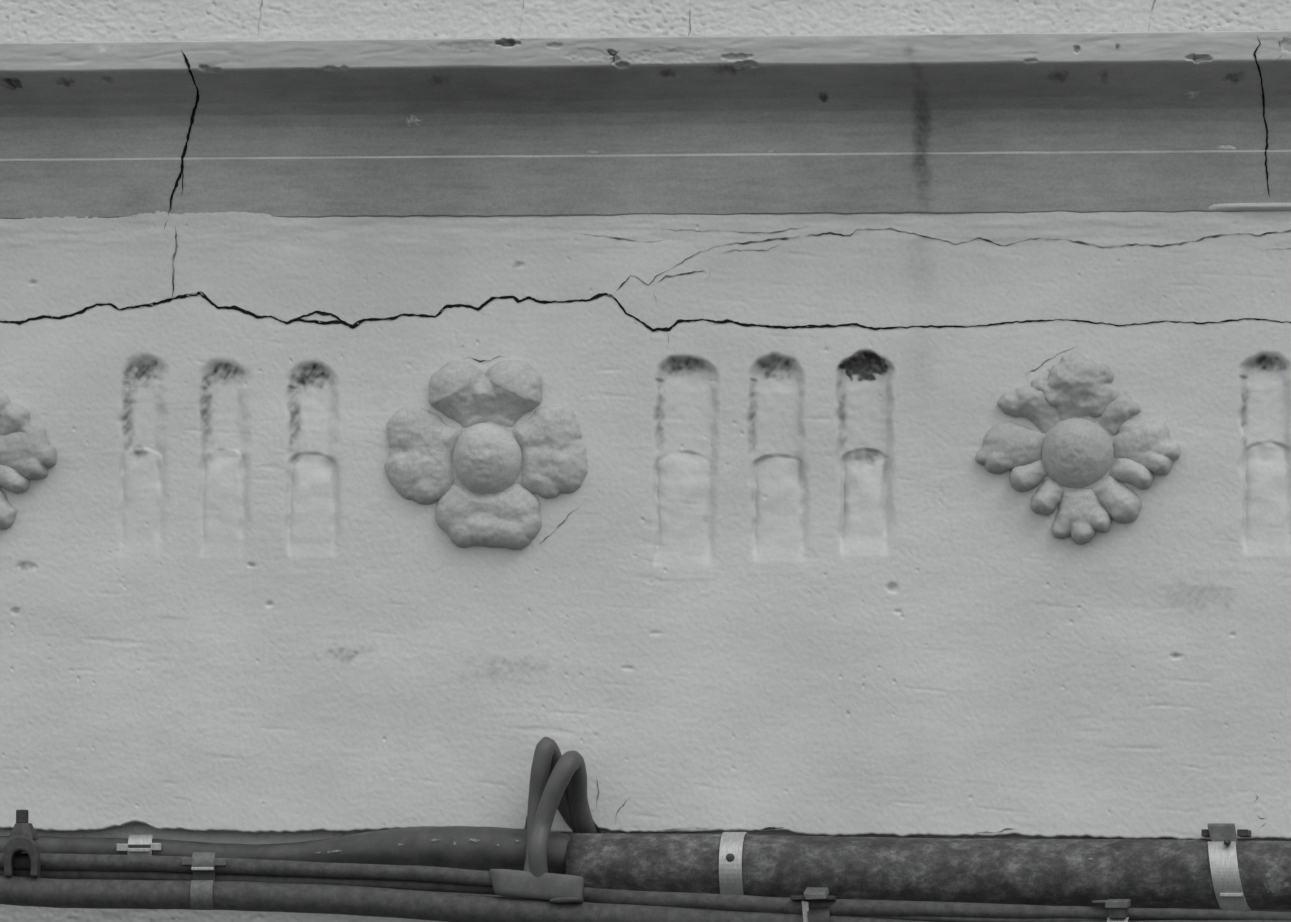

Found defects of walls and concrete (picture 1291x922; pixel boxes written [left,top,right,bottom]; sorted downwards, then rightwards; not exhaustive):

crack [0,39,1291,332]